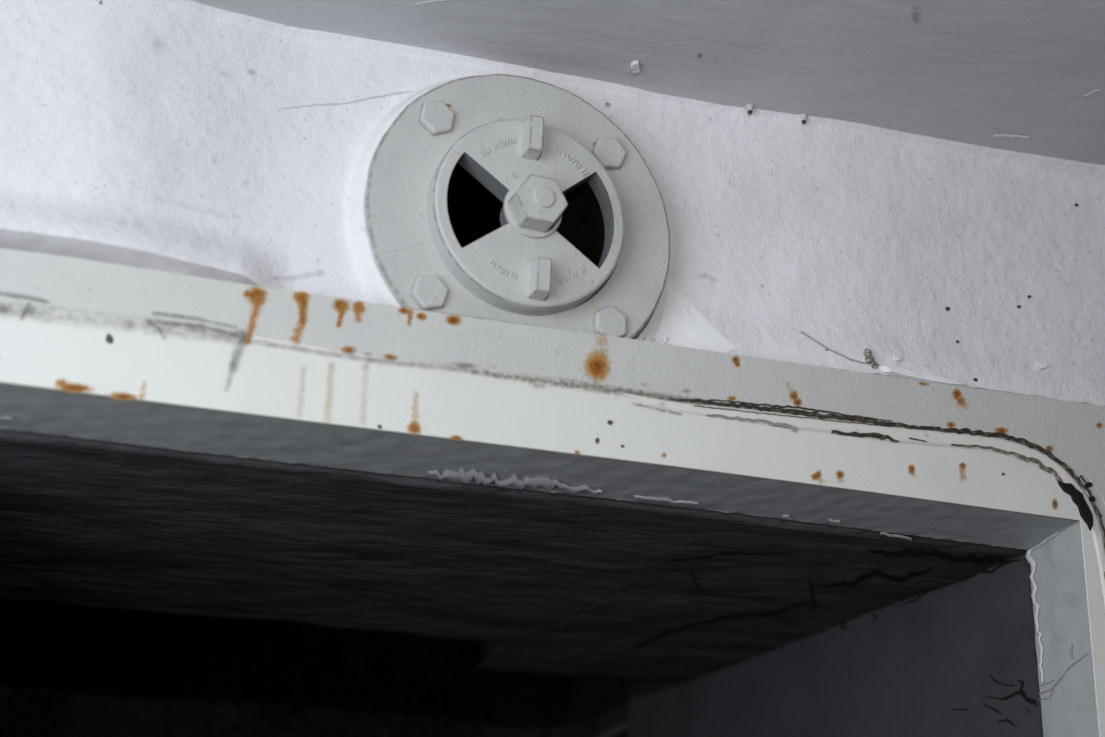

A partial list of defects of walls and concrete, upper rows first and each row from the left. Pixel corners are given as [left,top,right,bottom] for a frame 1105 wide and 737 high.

corrosion [243,287,266,343]
corrosion [291,291,308,342]
corrosion [334,300,365,327]
corrosion [399,307,426,325]
corrosion [586,353,609,381]
corrosion [56,380,89,392]
corrosion [953,389,965,404]
corrosion [408,420,420,434]
crack [670,398,1105,542]
crack [635,548,1020,647]
crack [951,643,1088,727]